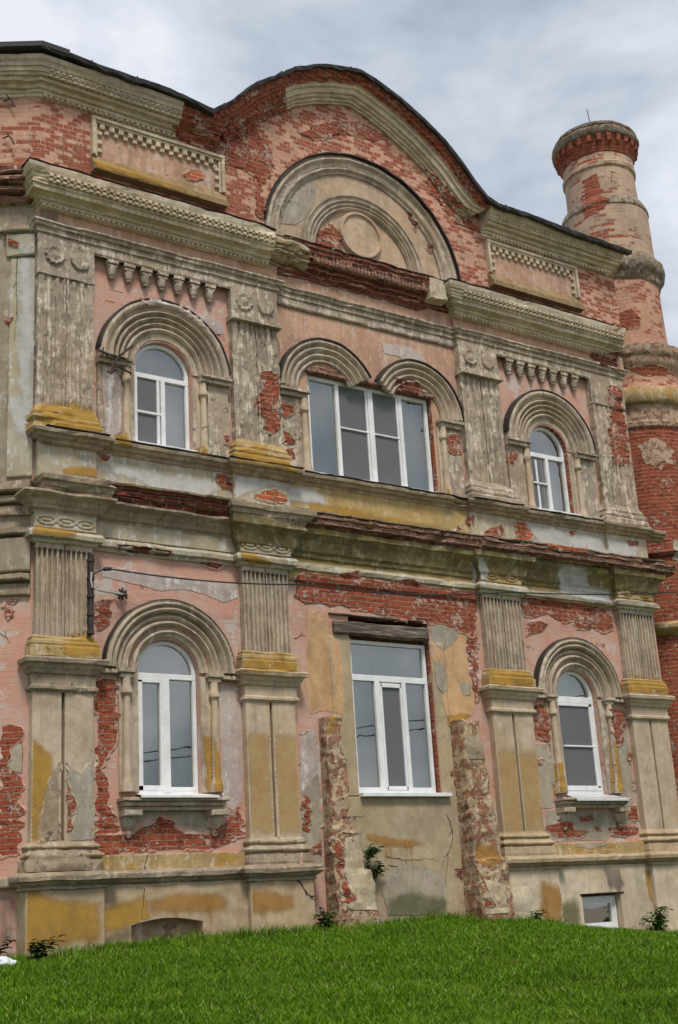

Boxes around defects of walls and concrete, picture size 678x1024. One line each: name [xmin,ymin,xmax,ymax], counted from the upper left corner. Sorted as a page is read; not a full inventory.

flaking render [172,124,317,225]
flaking render [581,170,614,221]
flaking render [254,369,296,458]
flaking render [607,384,676,467]
flaking render [521,596,614,637]
flaking render [294,570,485,767]
flaking render [0,725,27,860]
flaking render [40,676,246,855]
peeling [299,729,463,915]
crack [386,815,453,883]
peeling [481,879,509,914]
peeling [533,702,640,850]